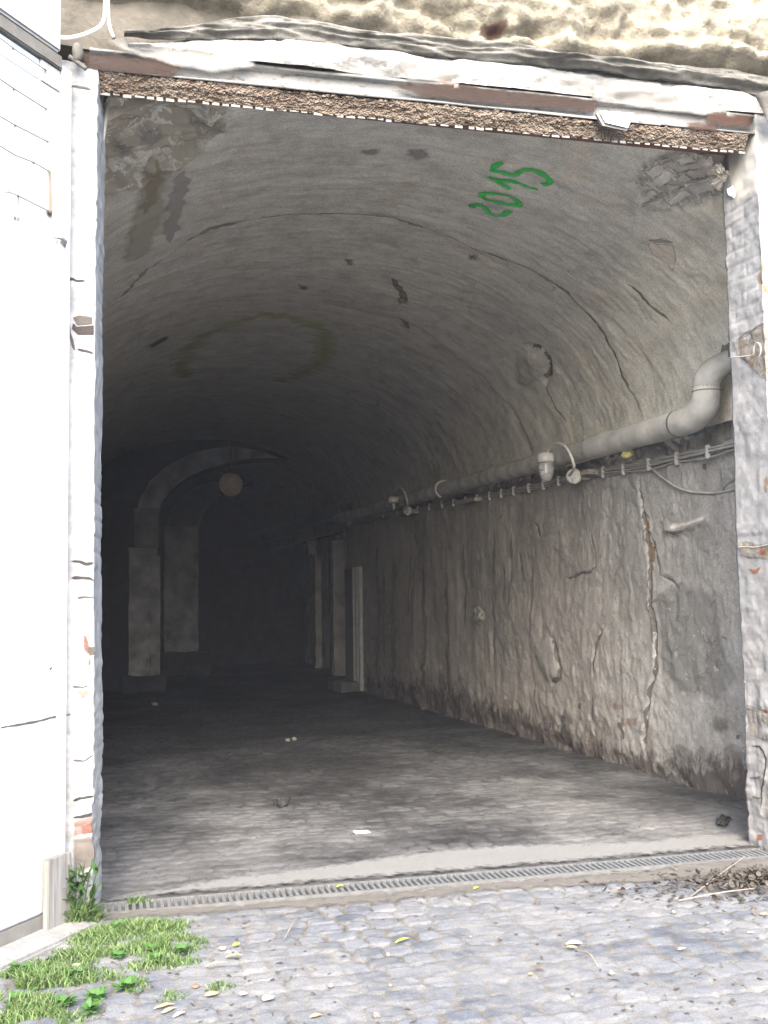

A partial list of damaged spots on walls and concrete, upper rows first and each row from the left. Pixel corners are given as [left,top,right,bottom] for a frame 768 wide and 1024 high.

corrosion [398,84,597,112]
corrosion [687,112,751,131]
water stain [127,163,189,259]
flaking render [637,151,736,213]
crack [121,214,291,297]
crack [316,213,640,410]
crack [629,285,668,319]
crack [546,383,567,422]
crack [639,486,677,744]